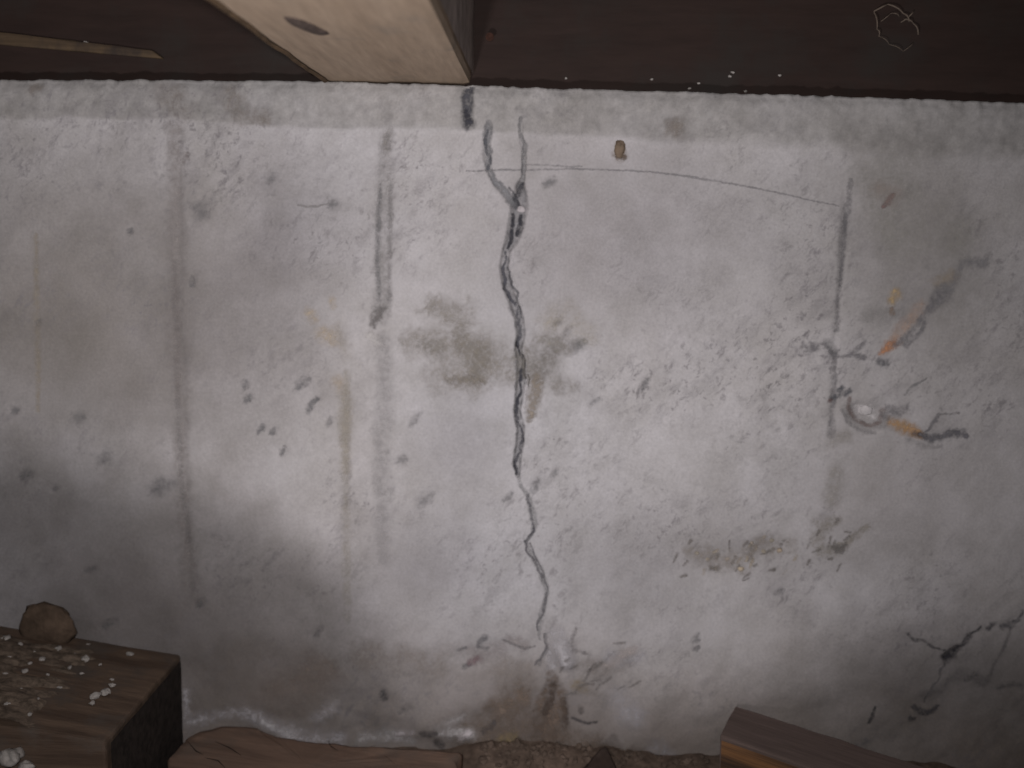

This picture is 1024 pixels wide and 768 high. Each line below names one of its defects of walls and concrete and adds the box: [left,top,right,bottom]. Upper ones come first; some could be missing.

crack [805,343,865,360]
damp [436,337,565,419]
crack [473,117,836,665]
crack [918,412,969,442]
crack [907,614,1023,720]
damp [190,708,344,742]
damp [358,717,474,745]